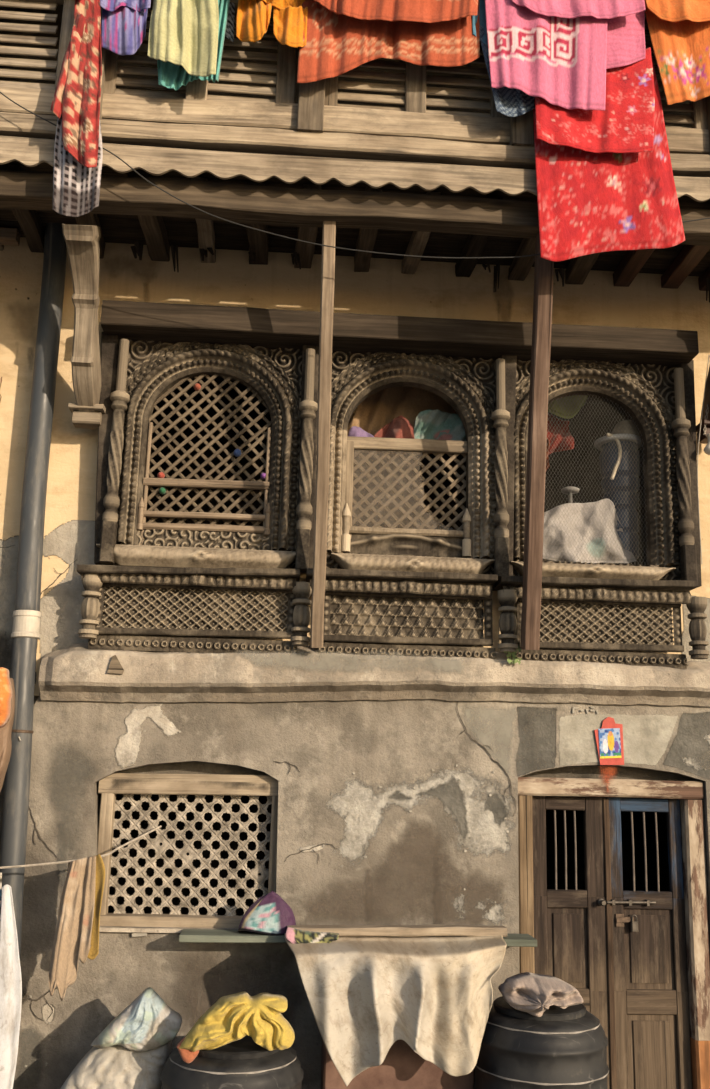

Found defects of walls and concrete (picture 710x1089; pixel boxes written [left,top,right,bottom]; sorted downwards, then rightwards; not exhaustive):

peeling [0,534,19,650]
peeling [35,520,96,682]
peeling [682,595,710,662]
peeling [114,703,181,769]
peeling [298,764,515,867]
crack [457,702,516,816]